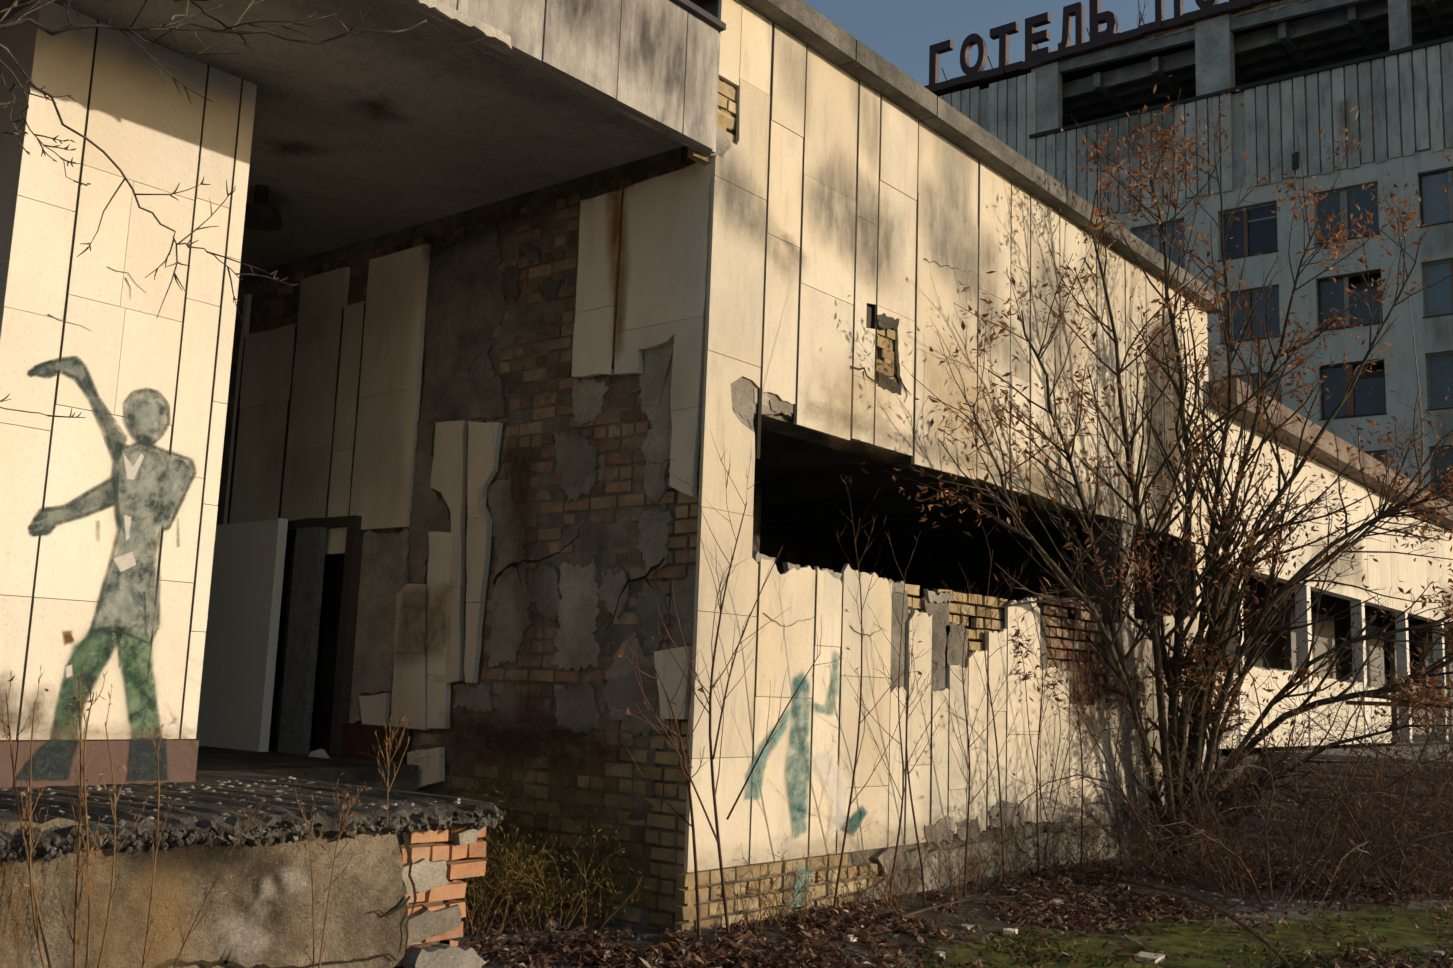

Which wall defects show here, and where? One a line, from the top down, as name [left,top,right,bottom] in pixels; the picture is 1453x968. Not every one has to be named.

spalling [416,0,512,51]
corrosion [610,191,624,346]
spalling [866,306,901,395]
spalling [731,377,794,428]
crack [493,517,587,586]
flaking render [452,343,696,737]
crack [604,557,665,633]
spalling [0,834,94,862]
spalling [125,823,307,854]
spalling [343,813,491,836]
flaking render [403,943,487,968]